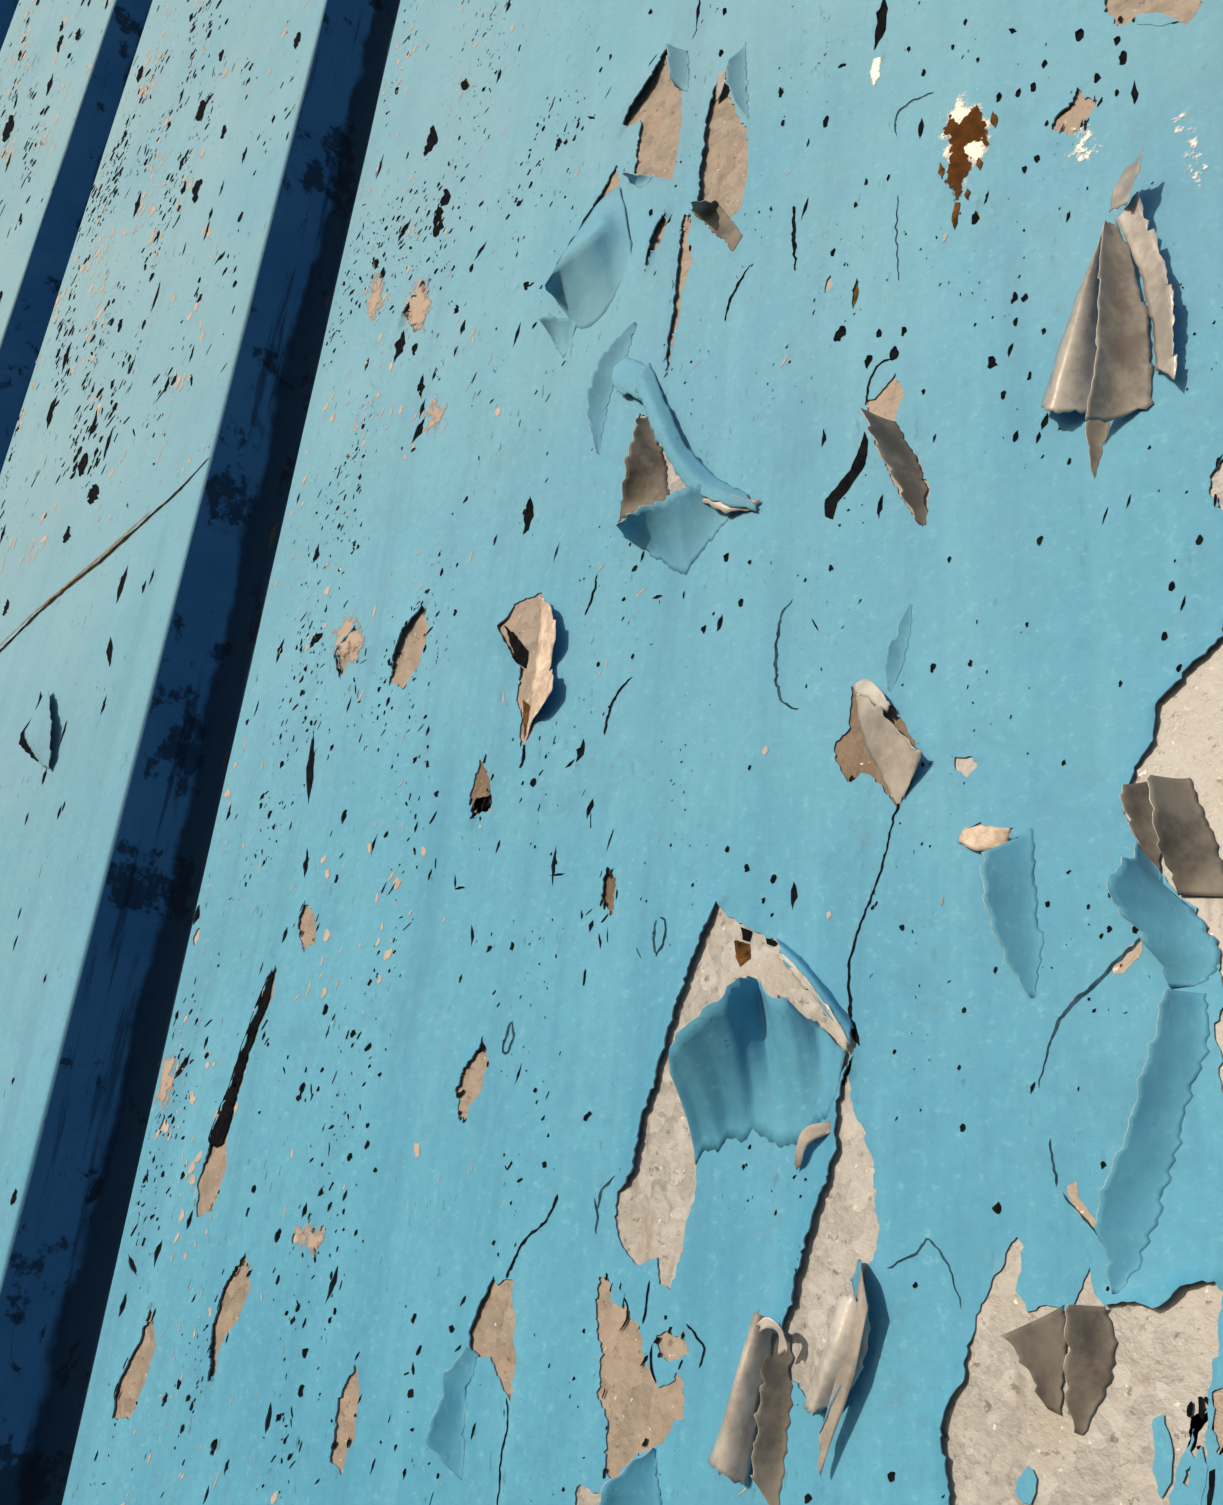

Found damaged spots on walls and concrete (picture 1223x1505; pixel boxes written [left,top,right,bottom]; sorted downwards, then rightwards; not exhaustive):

crack [0,459,207,652]
peeling [524,43,690,358]
peeling [586,322,760,575]
peeling [689,41,749,252]
peeling [824,327,930,526]
rust [938,95,998,229]
peeling [1013,148,1178,479]
peeling [498,594,556,763]
peeling [835,604,922,806]
crack [847,803,900,1046]
peeling [942,637,1223,1505]
peeling [576,904,880,1505]